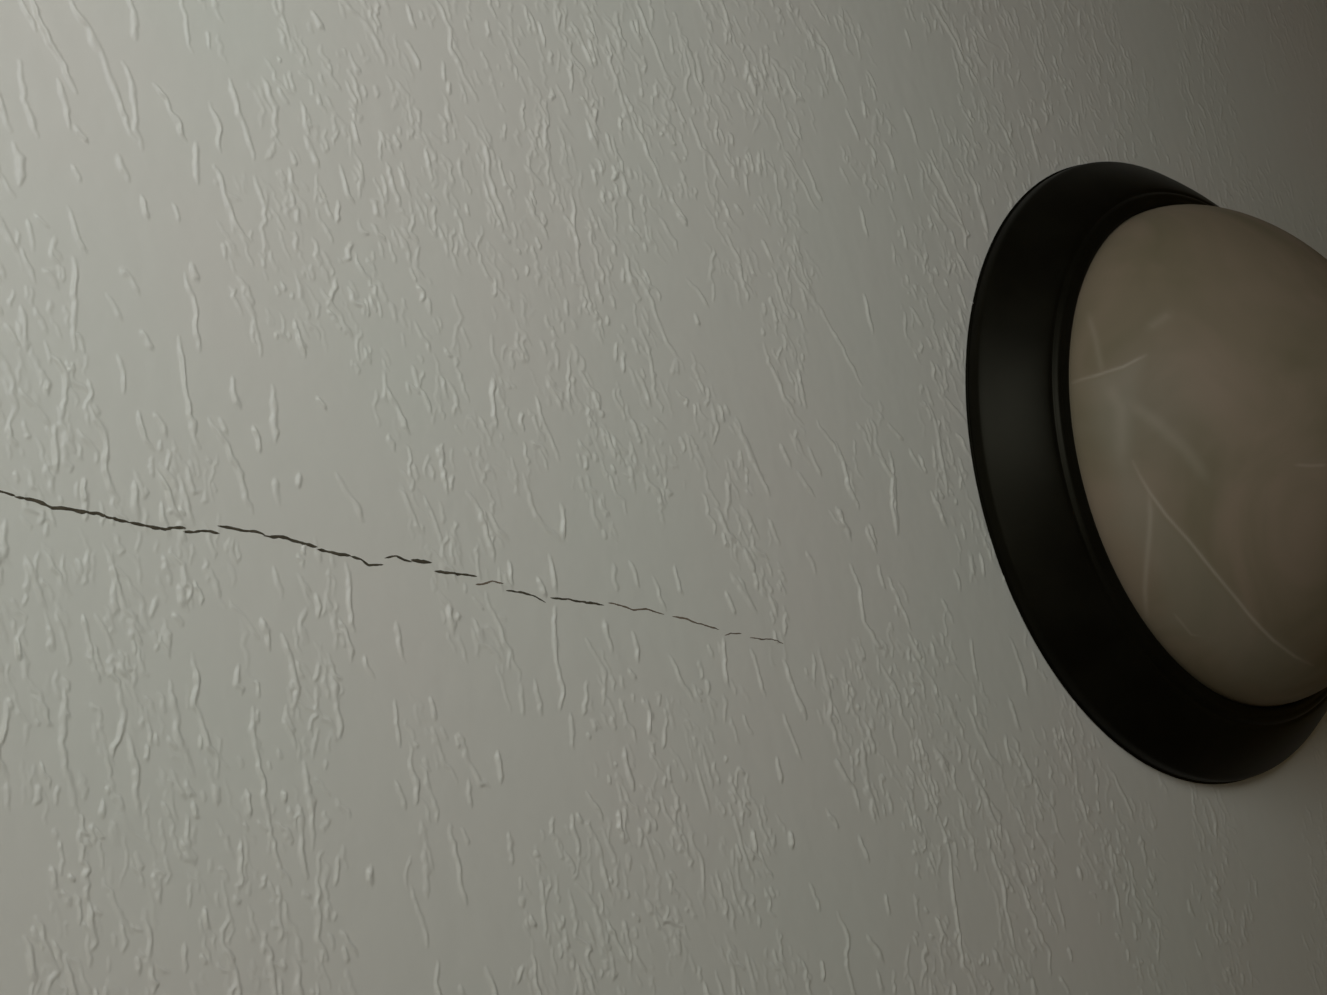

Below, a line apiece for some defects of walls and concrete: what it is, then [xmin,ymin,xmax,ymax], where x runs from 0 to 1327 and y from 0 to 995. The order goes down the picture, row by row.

crack [0,490,783,644]